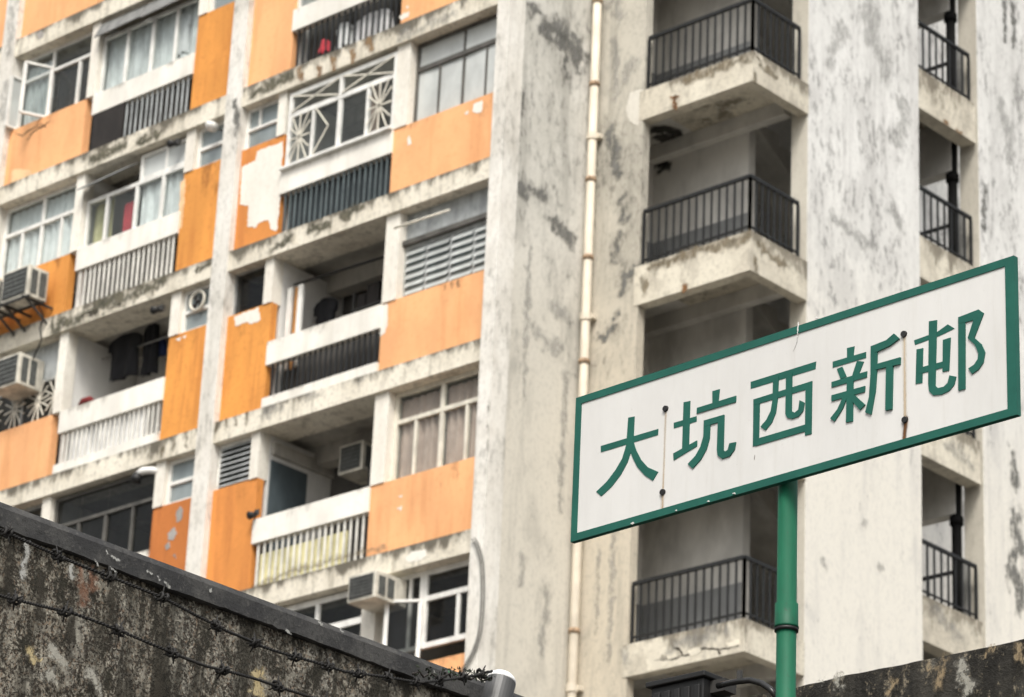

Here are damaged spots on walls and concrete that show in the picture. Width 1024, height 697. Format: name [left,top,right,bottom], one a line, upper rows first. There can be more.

damp [527,2,590,79]
damp [683,56,778,85]
damp [605,125,623,178]
peeling [240,142,283,231]
damp [517,174,548,202]
damp [549,216,577,248]
damp [610,194,787,297]
peeling [234,307,261,326]
damp [1011,451,1019,488]
peeling [165,506,183,559]
damp [3,543,48,620]
damp [1005,508,1024,613]